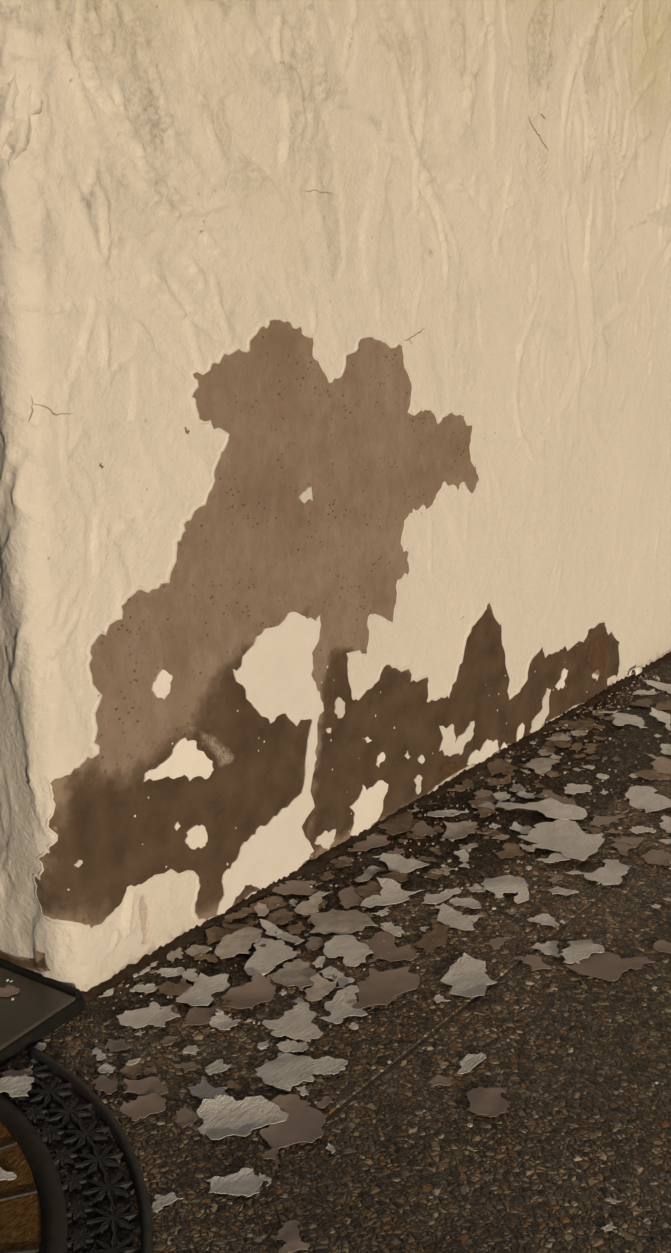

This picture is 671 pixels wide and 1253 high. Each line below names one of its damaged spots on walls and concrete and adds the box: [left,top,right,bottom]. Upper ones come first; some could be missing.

peeling [33,316,671,932]